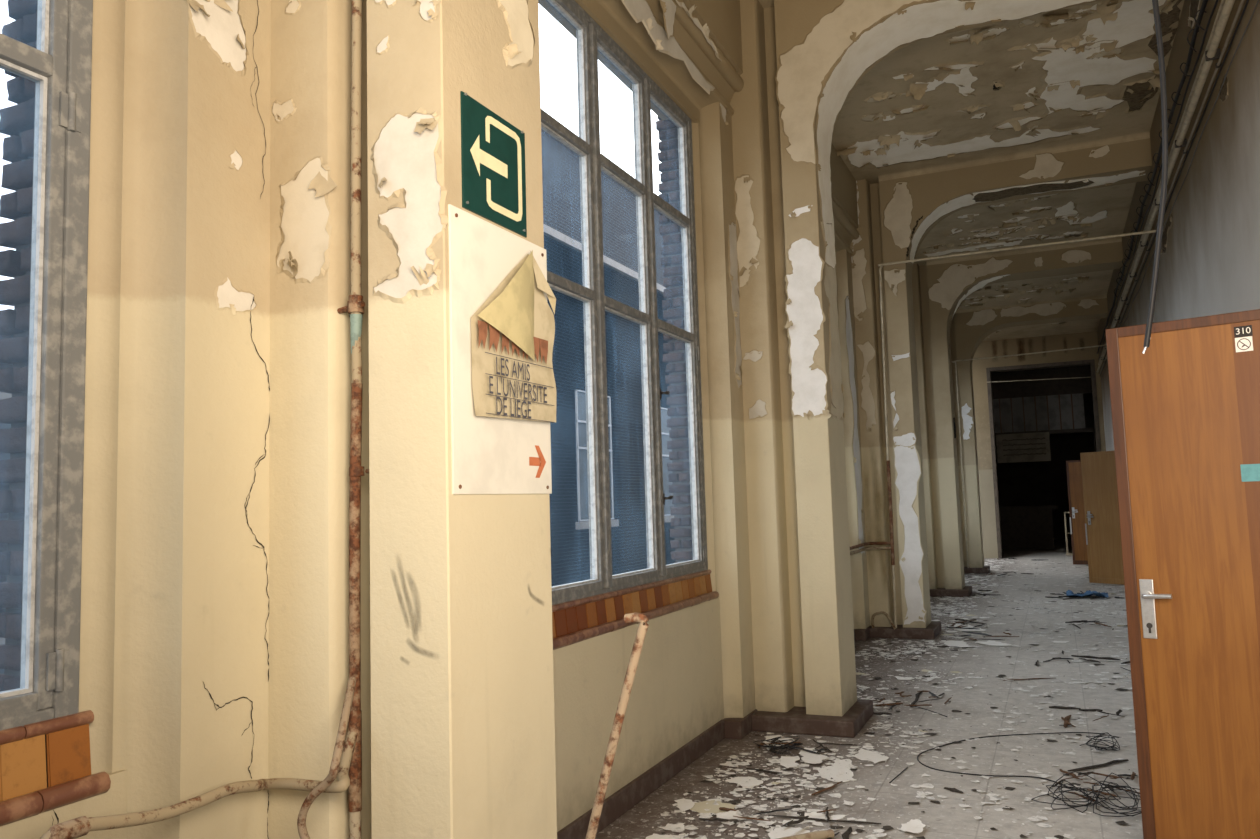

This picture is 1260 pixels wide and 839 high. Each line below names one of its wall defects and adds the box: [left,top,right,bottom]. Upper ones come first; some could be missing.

peeling [186,0,249,77]
peeling [376,35,390,55]
peeling [411,0,441,23]
peeling [496,0,535,69]
peeling [646,0,697,50]
peeling [275,156,337,284]
peeling [370,107,448,304]
peeling [734,174,763,288]
peeling [775,0,1200,625]